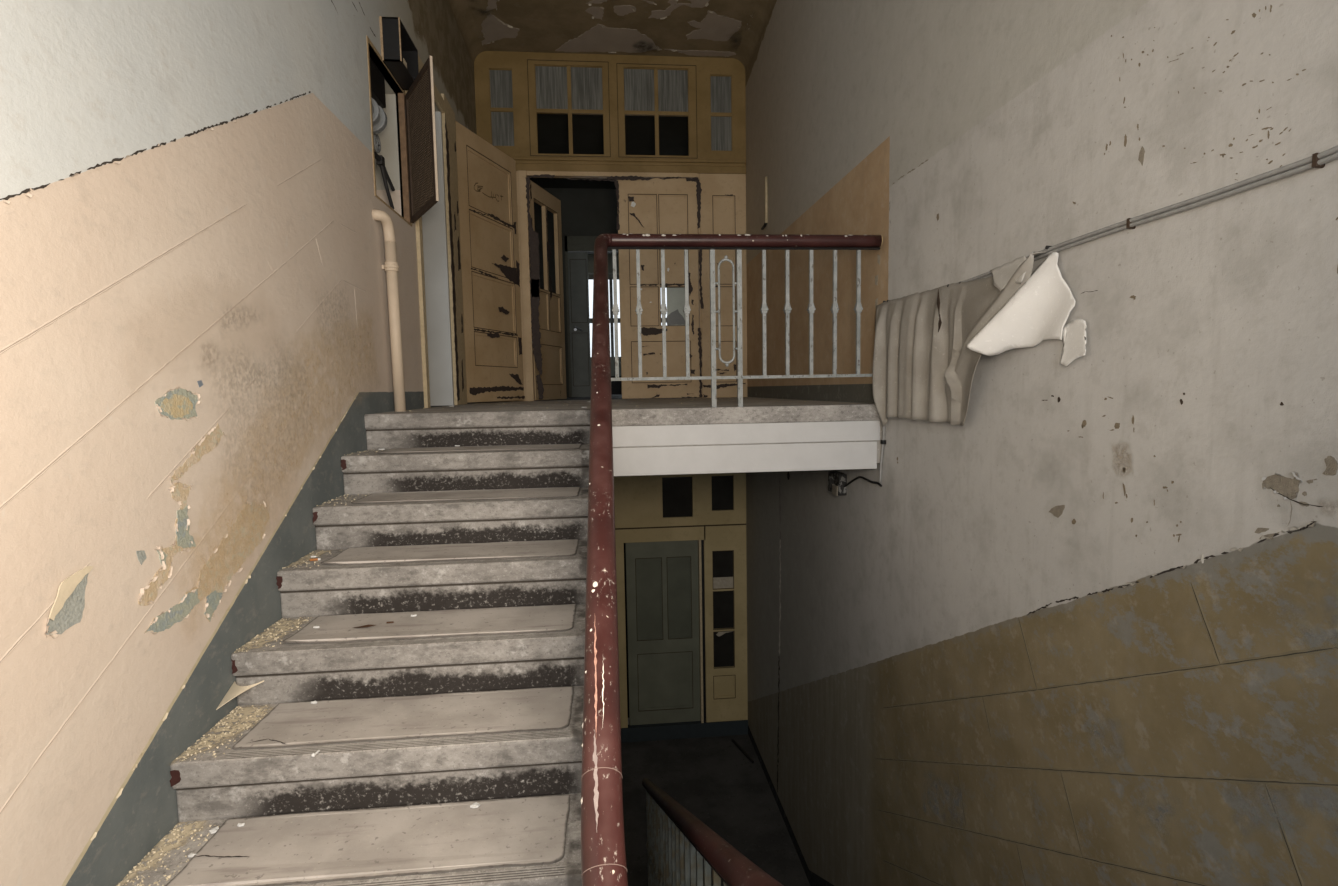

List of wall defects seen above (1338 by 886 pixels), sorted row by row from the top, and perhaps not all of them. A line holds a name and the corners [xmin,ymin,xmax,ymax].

flaking render [481,0,519,45]
flaking render [555,0,742,57]
peeling [155,387,200,421]
flaking render [1262,456,1338,507]
peeling [136,423,290,634]
peeling [45,566,93,638]